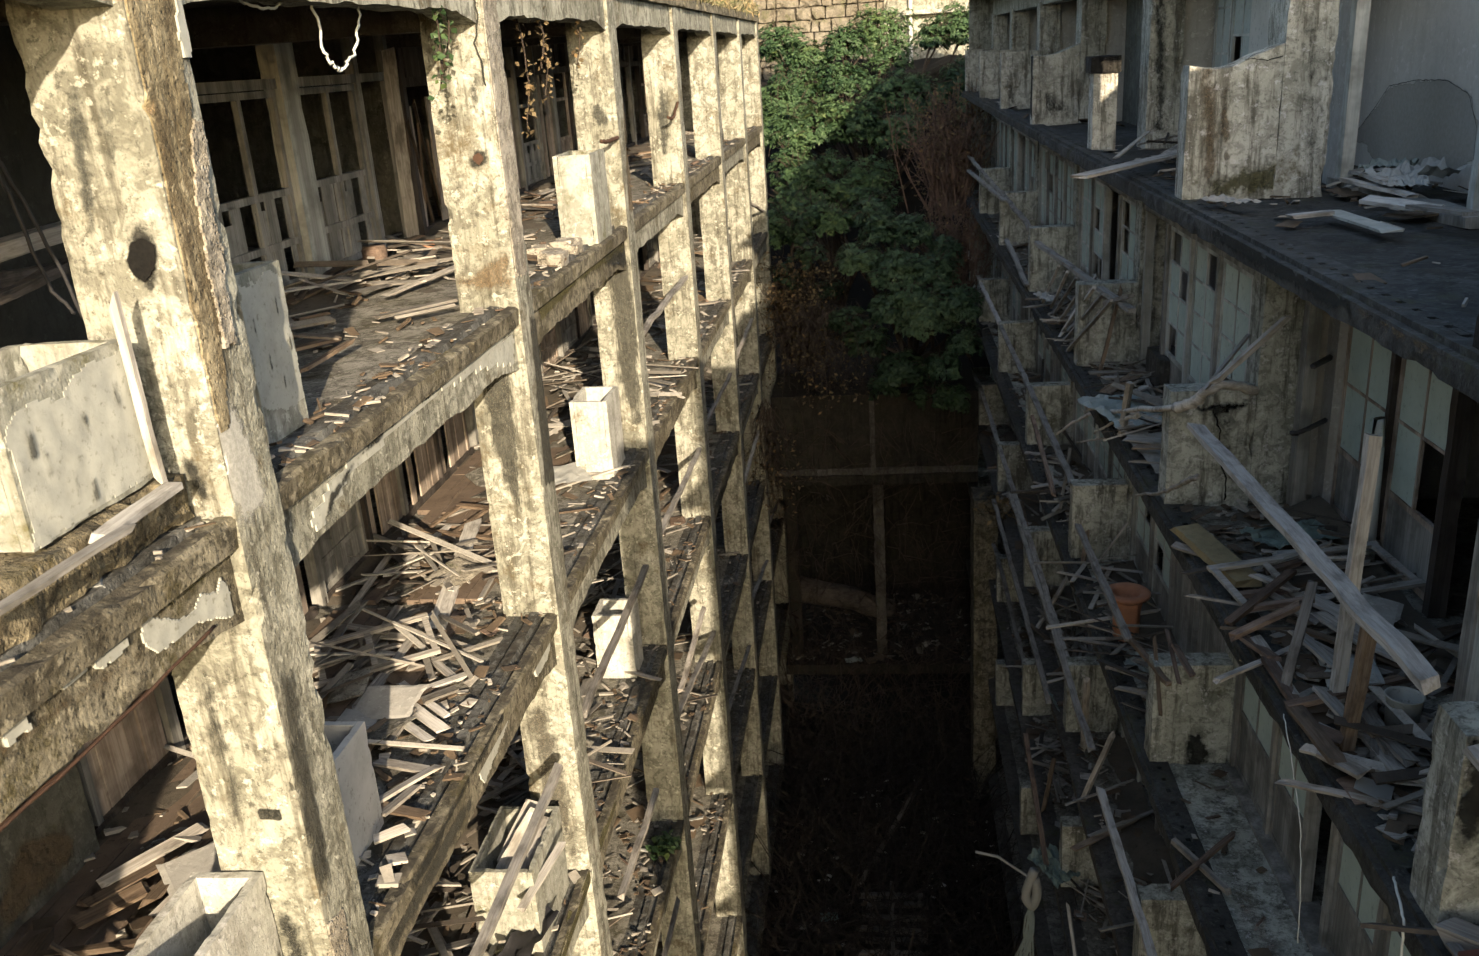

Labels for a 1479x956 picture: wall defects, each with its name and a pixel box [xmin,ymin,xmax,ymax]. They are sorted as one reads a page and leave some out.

spalling [69,93,92,226]
spalling [124,0,305,433]
rust [470,151,488,167]
flaking render [1357,79,1478,169]
peeling [0,577,234,832]
damp [1453,744,1479,840]